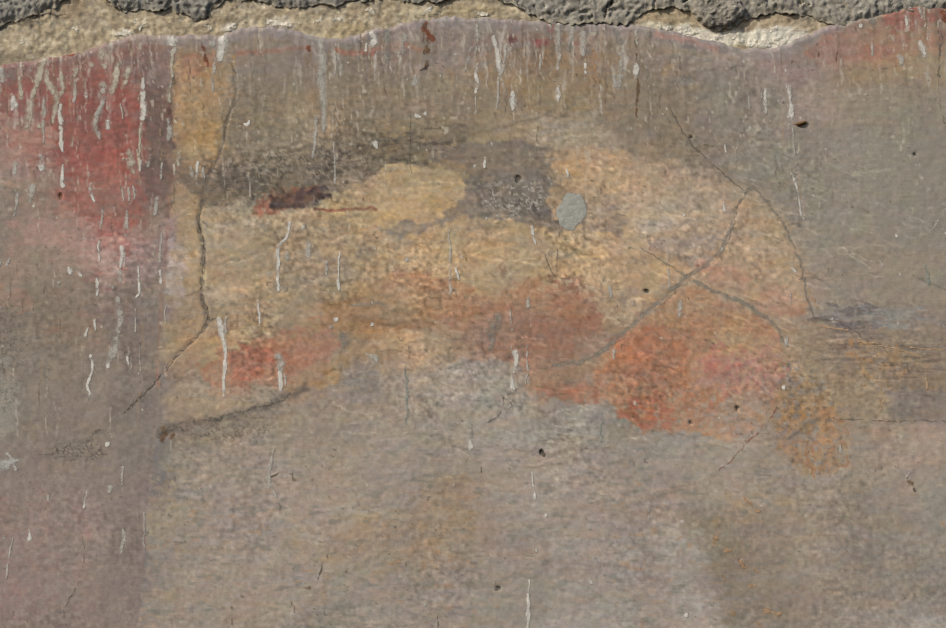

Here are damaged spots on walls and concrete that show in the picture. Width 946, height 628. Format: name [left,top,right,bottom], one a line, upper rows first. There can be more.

water stain [10,58,87,171]
water stain [90,50,131,139]
water stain [122,78,205,179]
water stain [167,36,178,103]
spalling [0,0,546,66]
spalling [619,0,832,50]
water stain [106,186,141,374]
crack [125,101,236,413]
crack [553,112,876,367]